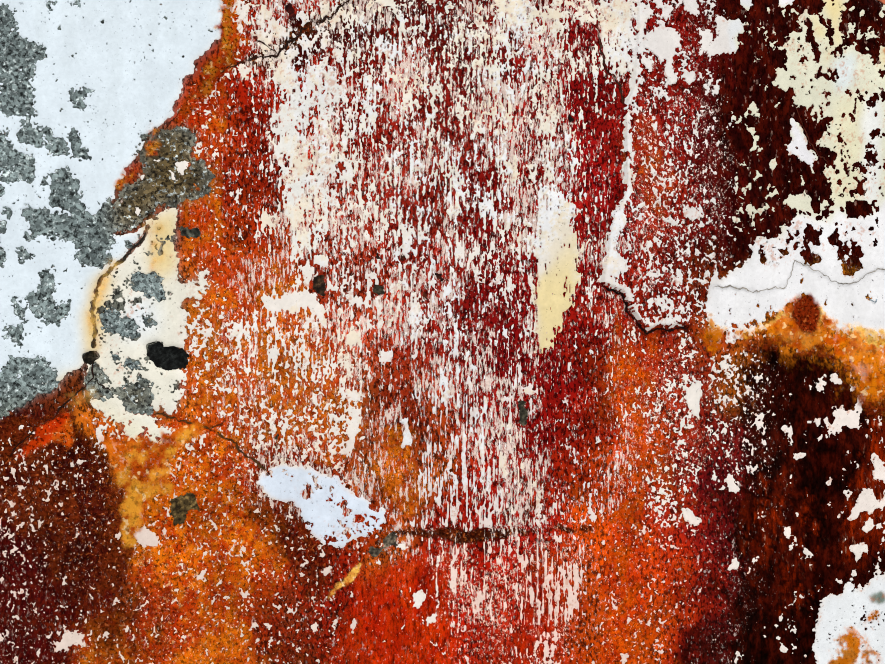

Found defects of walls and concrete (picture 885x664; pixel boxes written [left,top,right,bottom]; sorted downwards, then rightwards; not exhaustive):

crack [196,0,349,92]
crack [596,21,625,106]
rust [76,0,363,664]
crack [602,285,687,335]
rust [700,295,885,405]
rust [23,414,74,456]
peeling [804,371,882,442]
peeling [0,433,80,664]
peeling [129,499,184,574]
peeling [763,438,885,664]
peeling [30,591,109,664]
rust [829,629,877,664]